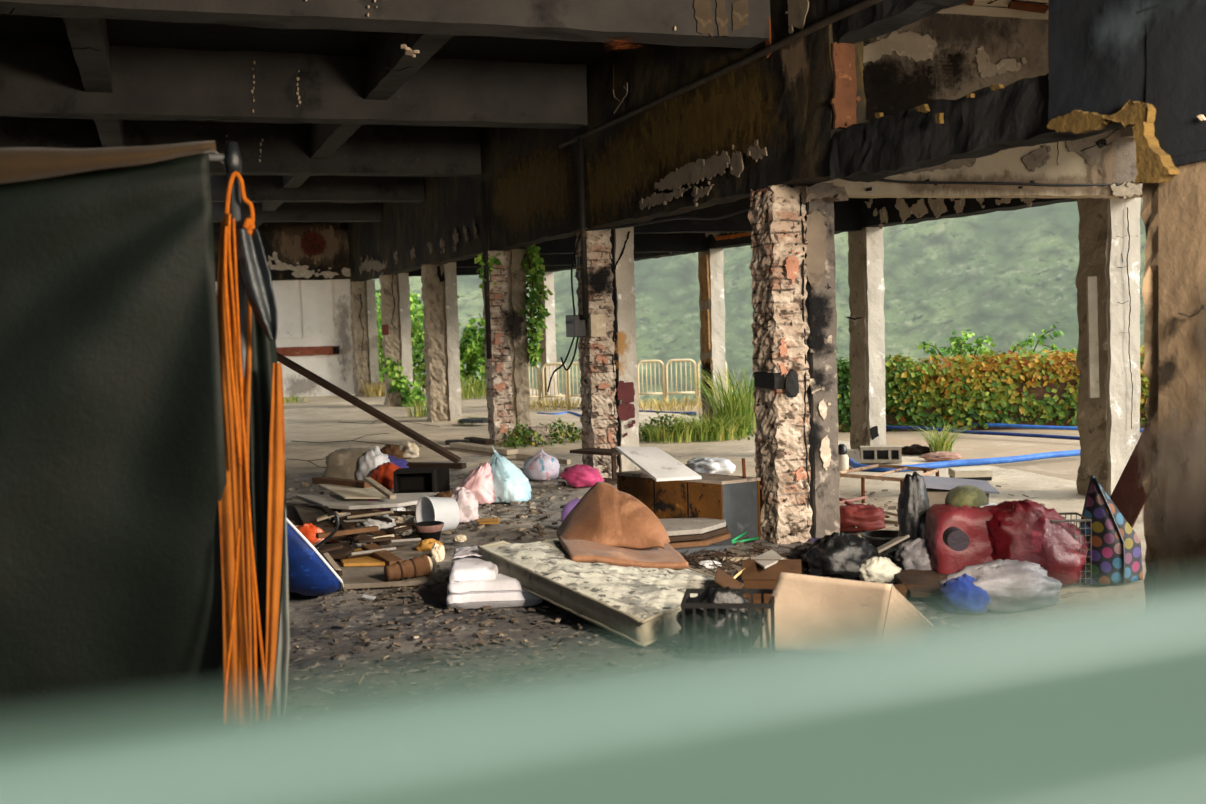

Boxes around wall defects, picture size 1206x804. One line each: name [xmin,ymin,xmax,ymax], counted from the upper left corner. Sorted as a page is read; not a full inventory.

spalling [1008,1,1049,13]
flaking render [830,30,937,129]
peeling [974,46,1027,91]
spalling [915,104,944,124]
peeling [639,140,768,210]
peeling [865,145,1051,229]
peeling [1047,99,1180,199]
peeling [267,219,479,282]
peeling [784,183,849,291]
flaking render [777,338,788,376]
peeling [598,380,636,443]
flaking render [791,467,807,482]